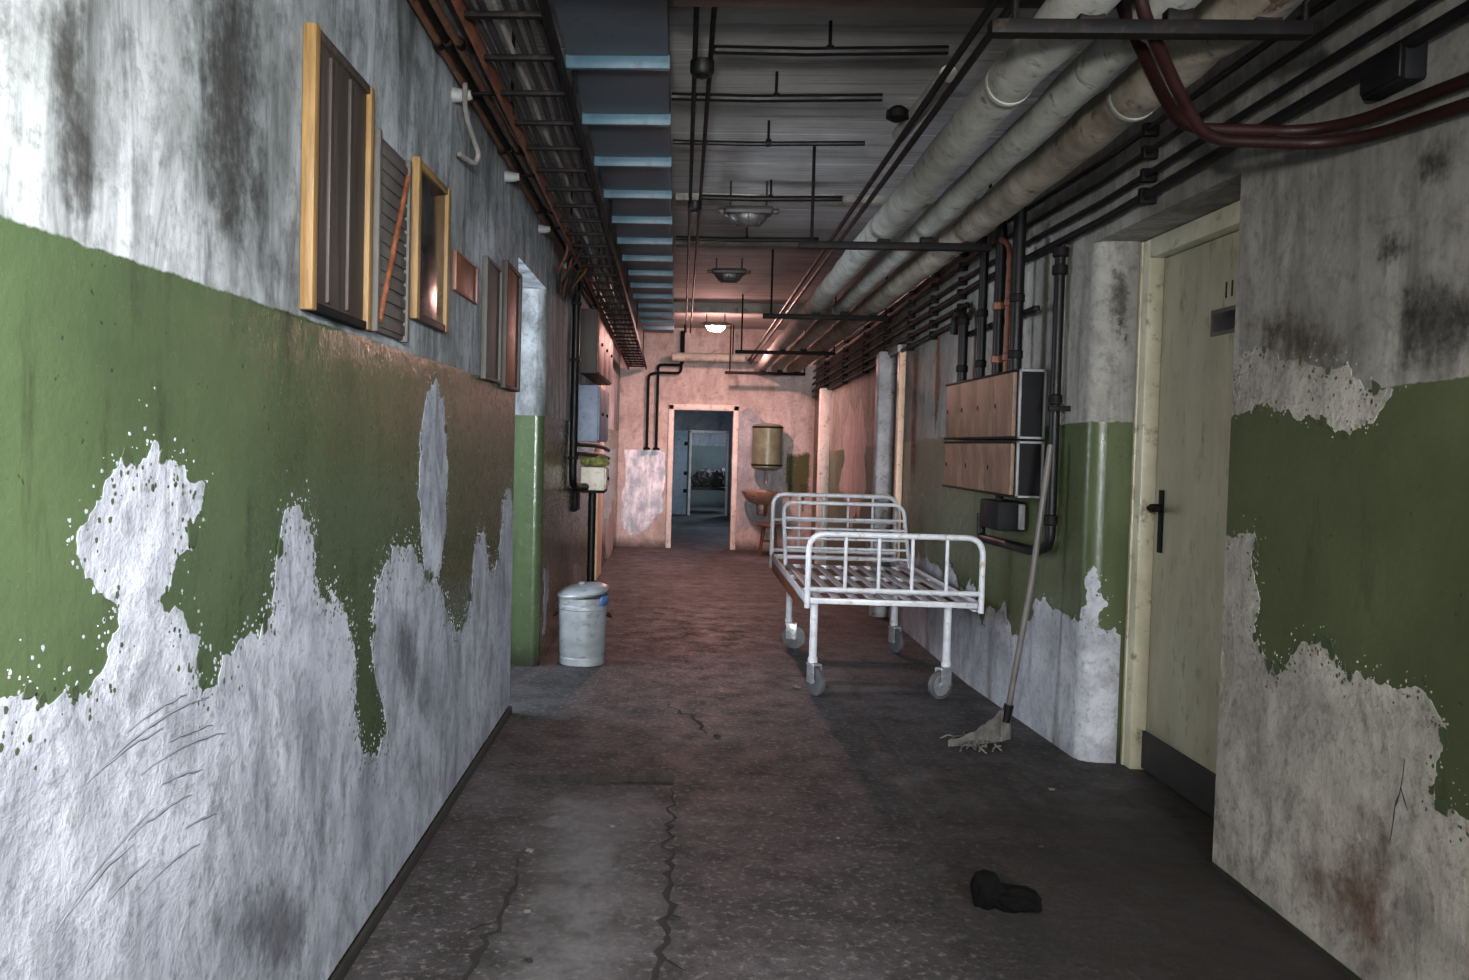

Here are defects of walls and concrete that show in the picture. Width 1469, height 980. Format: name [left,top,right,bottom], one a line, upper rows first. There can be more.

damp [57,4,90,207]
damp [201,0,254,228]
peeling [838,397,867,528]
peeling [1231,326,1407,441]
peeling [0,371,513,980]
peeling [887,532,1121,763]
peeling [1212,515,1469,980]
crack [462,858,519,980]
crack [651,788,685,980]